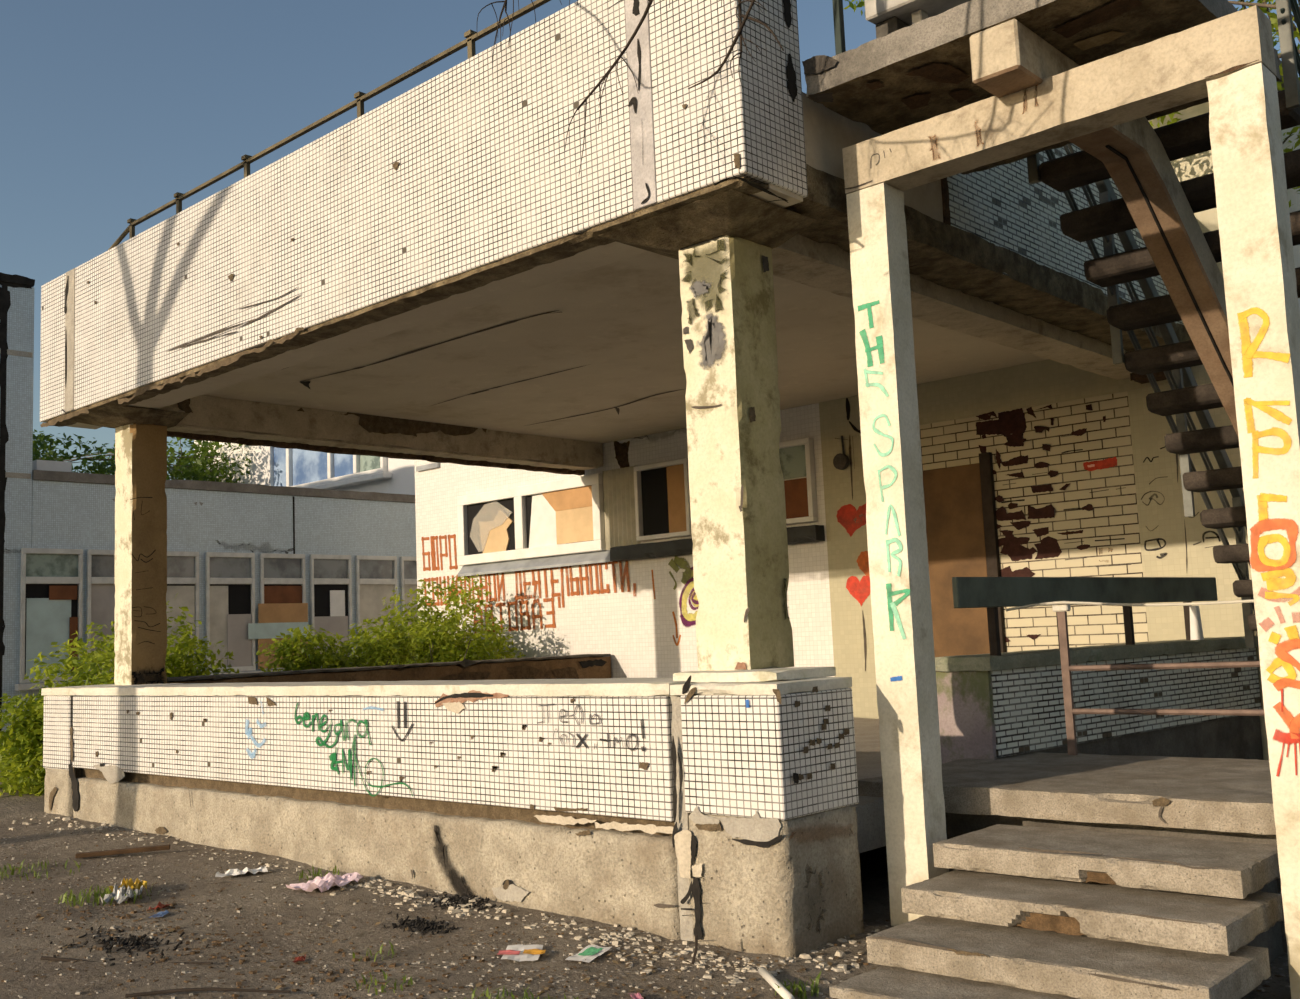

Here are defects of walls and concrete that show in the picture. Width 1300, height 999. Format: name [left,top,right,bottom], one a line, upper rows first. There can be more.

peeling [689,281,711,297]
peeling [683,313,726,368]
peeling [332,412,487,437]
peeling [976,404,1090,577]
spalling [434,671,508,713]
peeling [689,806,781,842]
spalling [1013,913,1085,936]